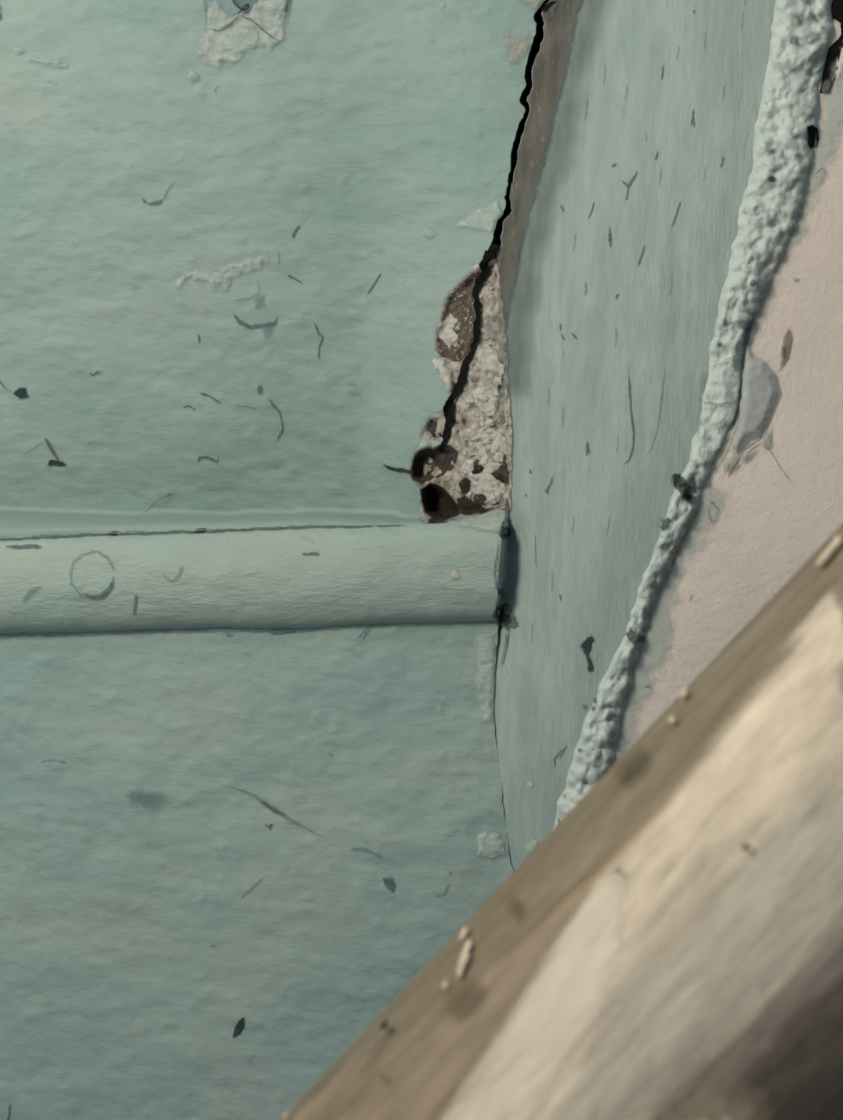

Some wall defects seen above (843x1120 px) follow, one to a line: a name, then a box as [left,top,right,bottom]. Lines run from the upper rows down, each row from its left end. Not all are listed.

spalling [383,0,594,531]
crack [438,0,556,453]